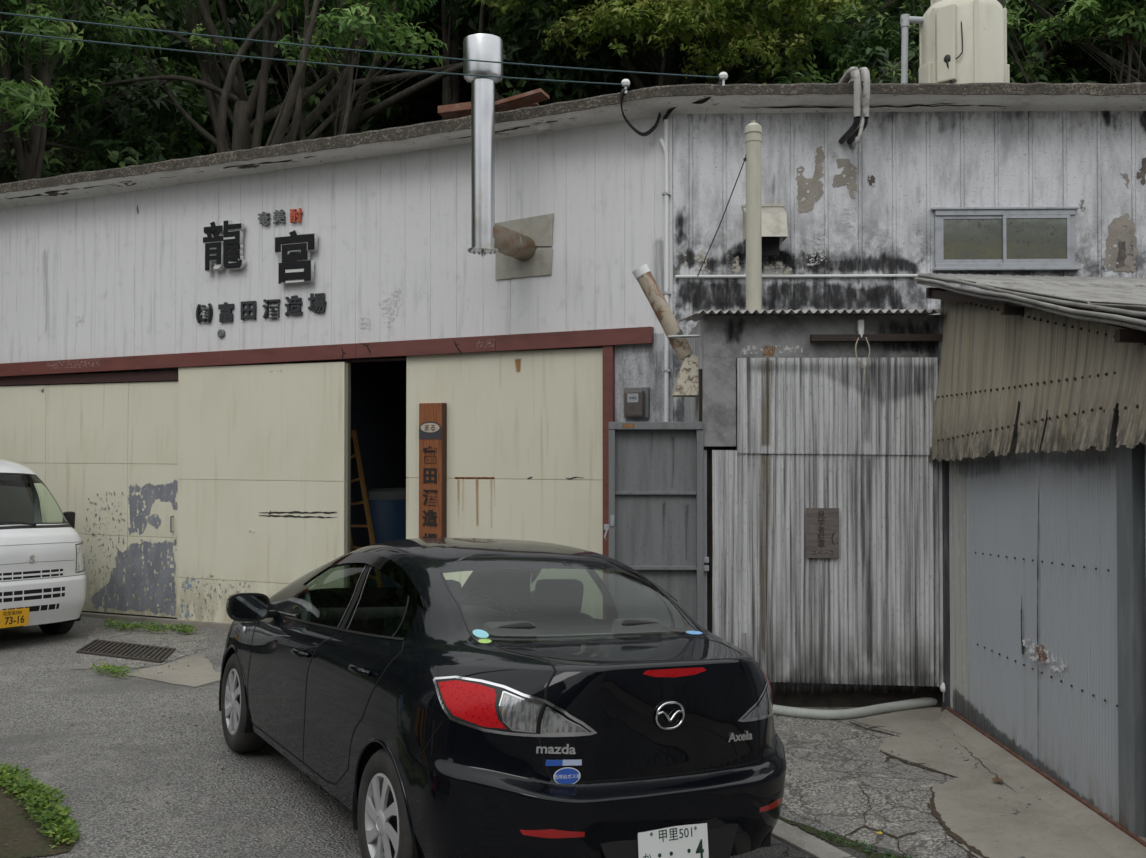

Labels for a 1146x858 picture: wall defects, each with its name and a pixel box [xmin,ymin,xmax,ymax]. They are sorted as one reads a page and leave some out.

peeling [796,146,875,228]
peeling [1121,158,1146,187]
leakage [676,214,746,342]
peeling [807,230,828,266]
leakage [762,251,935,357]
peeling [1103,213,1138,273]
peeling [85,480,256,620]
peeling [1022,638,1069,675]